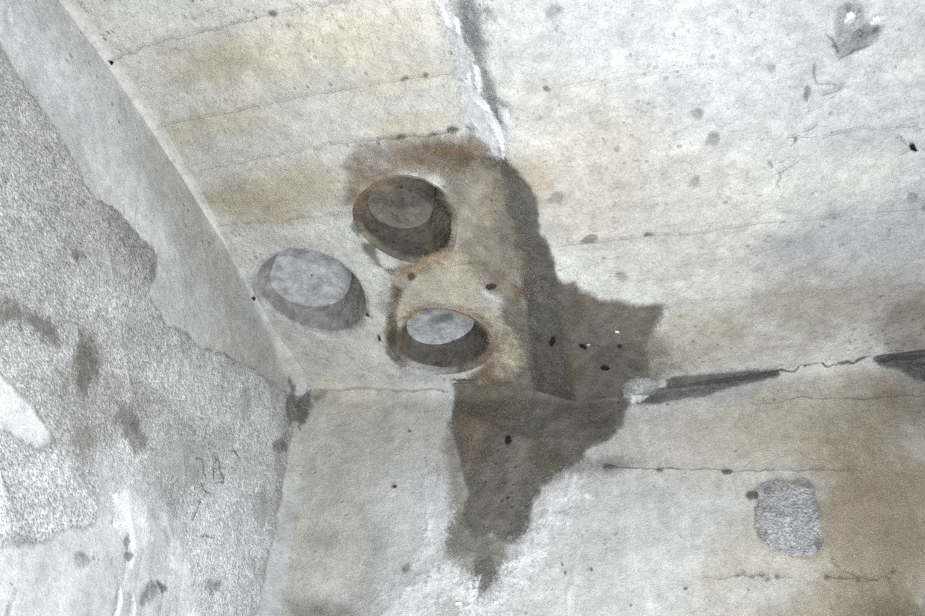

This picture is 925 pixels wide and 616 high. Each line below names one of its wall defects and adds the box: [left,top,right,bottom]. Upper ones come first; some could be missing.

spalling [837,5,880,56]
damp [353,222,440,281]
peeling [0,45,293,616]
damp [382,0,671,616]
crack [776,356,869,373]
damp [287,380,321,430]
crack [755,394,925,405]
crack [601,464,859,475]
spalling [746,480,825,557]
crack [703,573,796,581]
crack [823,562,894,583]